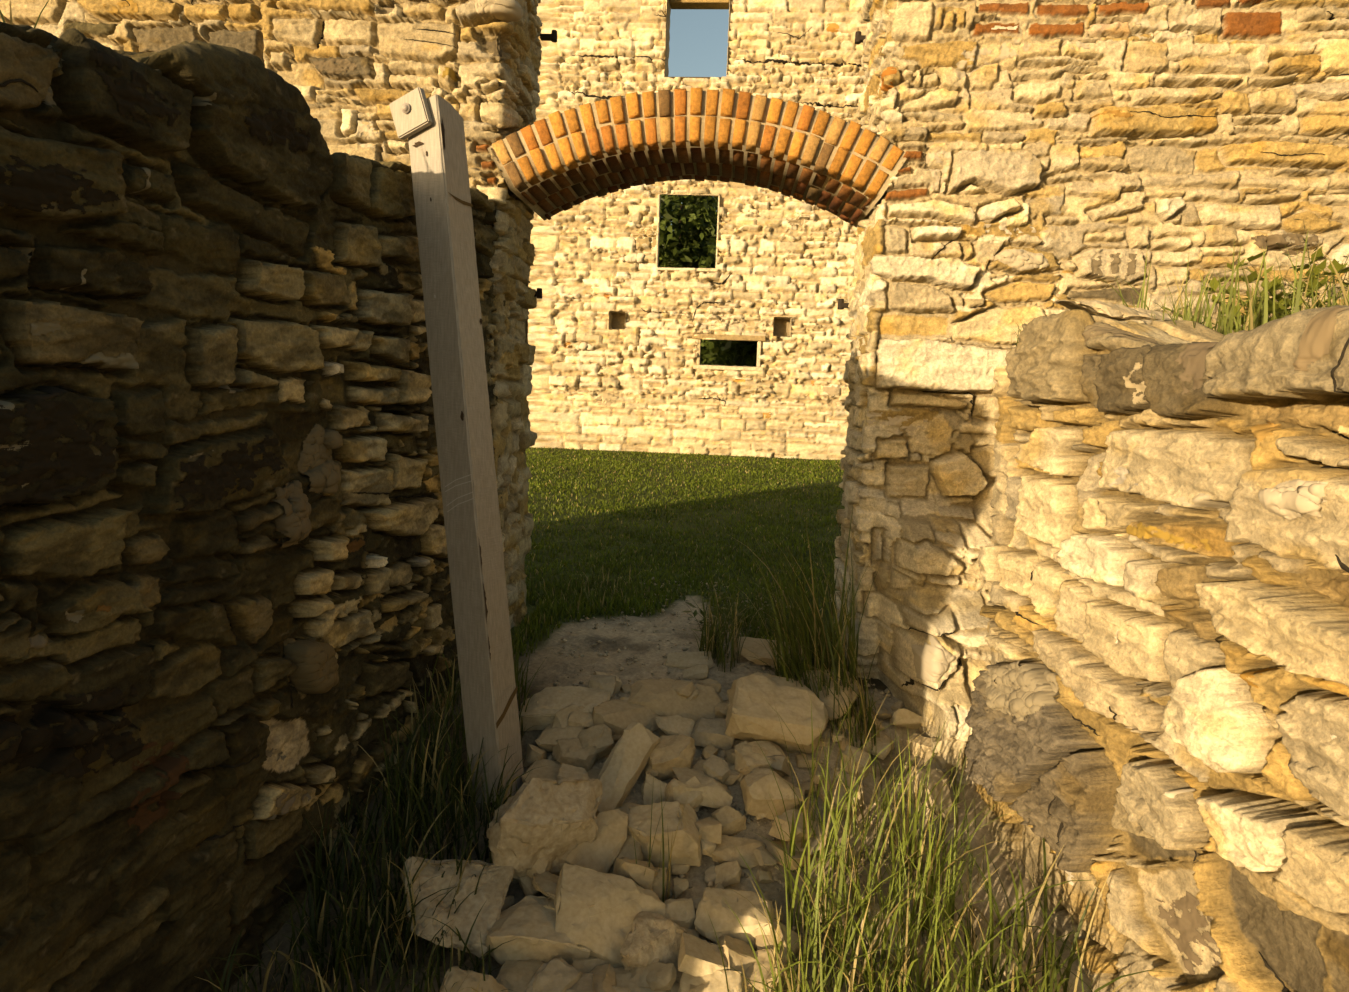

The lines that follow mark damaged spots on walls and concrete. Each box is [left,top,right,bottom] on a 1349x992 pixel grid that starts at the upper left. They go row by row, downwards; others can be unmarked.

crack [736,29,862,67]
crack [572,53,668,61]
crack [569,91,625,99]
crack [799,101,858,109]